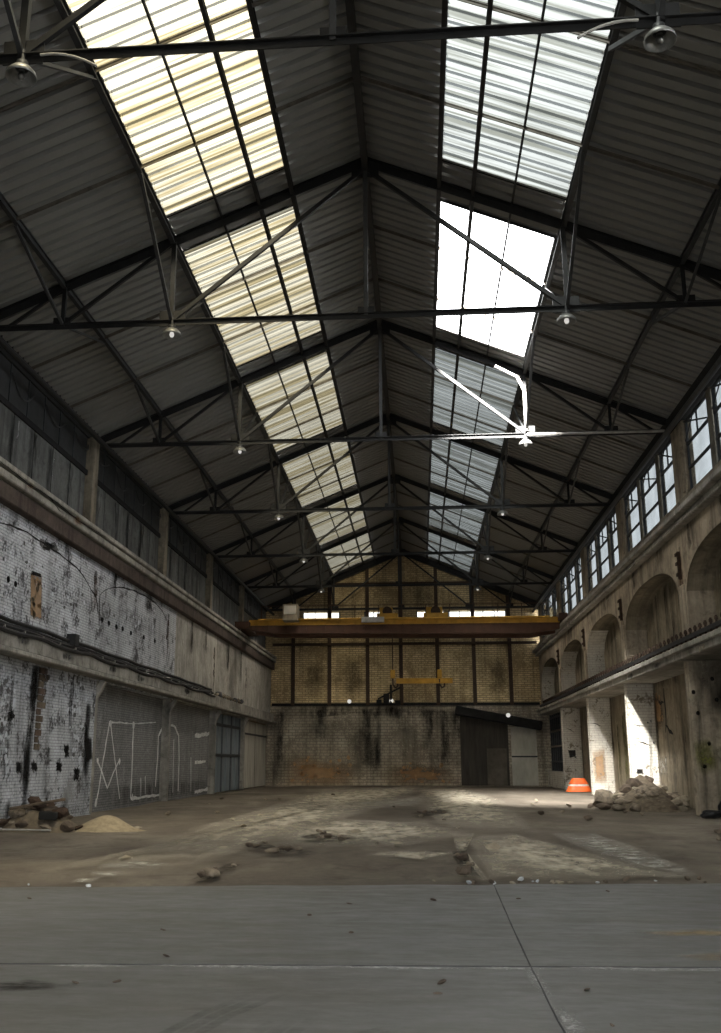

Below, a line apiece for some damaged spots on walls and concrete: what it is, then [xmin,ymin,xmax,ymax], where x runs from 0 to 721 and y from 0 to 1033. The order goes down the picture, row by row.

flaking render [3,539,85,619]
peeling [101,606,156,644]
flaking render [0,666,50,774]
peeling [56,654,87,782]